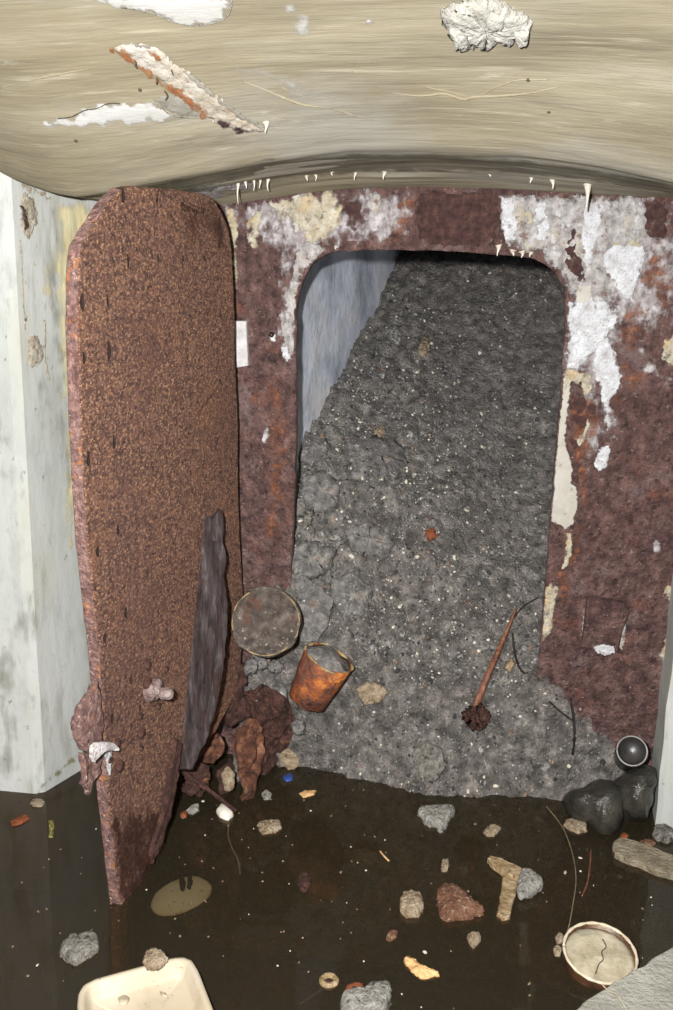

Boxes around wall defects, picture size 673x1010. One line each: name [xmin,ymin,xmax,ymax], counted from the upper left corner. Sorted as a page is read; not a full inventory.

spalling [42,42,267,134]
rust [345,200,365,231]
rust [395,192,500,247]
rust [644,201,668,238]
rust [565,228,586,282]
rust [642,256,673,289]
water stain [148,155,673,569]
rust [570,381,598,497]
water stain [542,584,558,640]
rust [78,752,104,795]